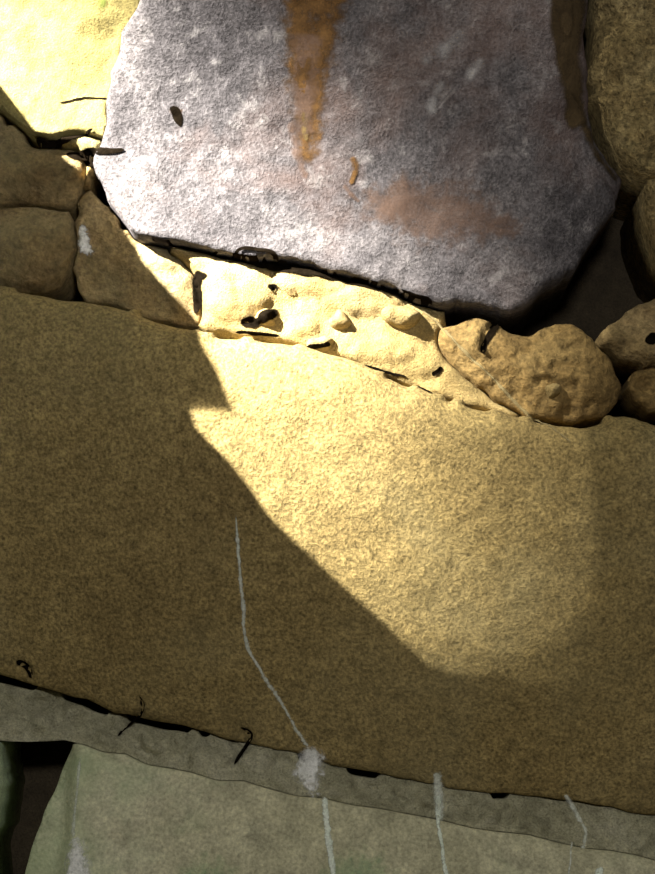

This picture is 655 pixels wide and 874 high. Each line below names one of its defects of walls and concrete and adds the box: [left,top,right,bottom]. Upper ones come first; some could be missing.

corrosion [283,0,346,173]
corrosion [349,157,359,200]